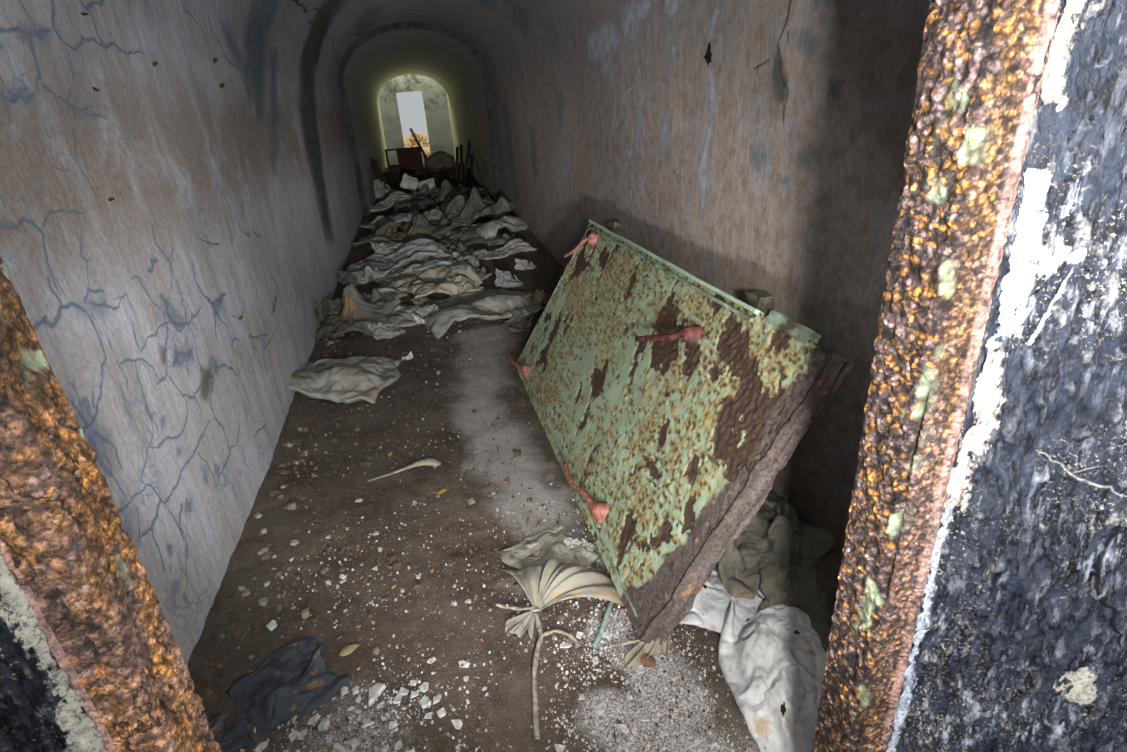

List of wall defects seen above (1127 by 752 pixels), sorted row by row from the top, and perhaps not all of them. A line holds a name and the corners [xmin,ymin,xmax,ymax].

damp [223,0,277,167]
damp [301,0,343,235]
crack [754,0,792,123]
crack [0,0,298,588]
flaking render [886,168,1087,752]
peeling [1052,667,1098,707]